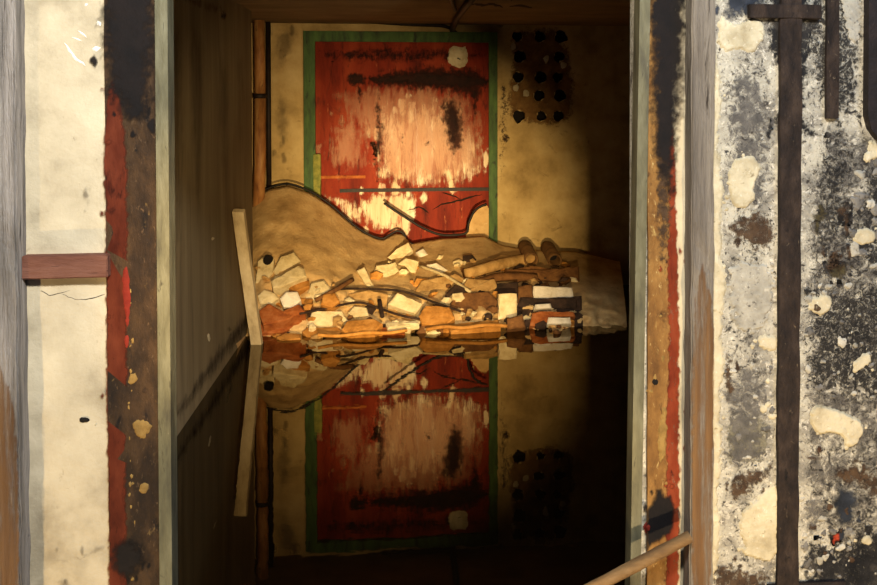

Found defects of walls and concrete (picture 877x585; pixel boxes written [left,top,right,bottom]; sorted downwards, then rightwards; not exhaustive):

peeling [447,46,468,68]
peeling [326,94,489,238]
corrosion [656,150,672,263]
damp [726,18,779,224]
peeling [79,82,152,585]
spalling [259,304,326,336]
spalling [494,282,534,303]
spalling [529,311,575,328]
flaking render [712,16,777,580]
peeling [803,140,877,450]
peeling [799,496,875,579]